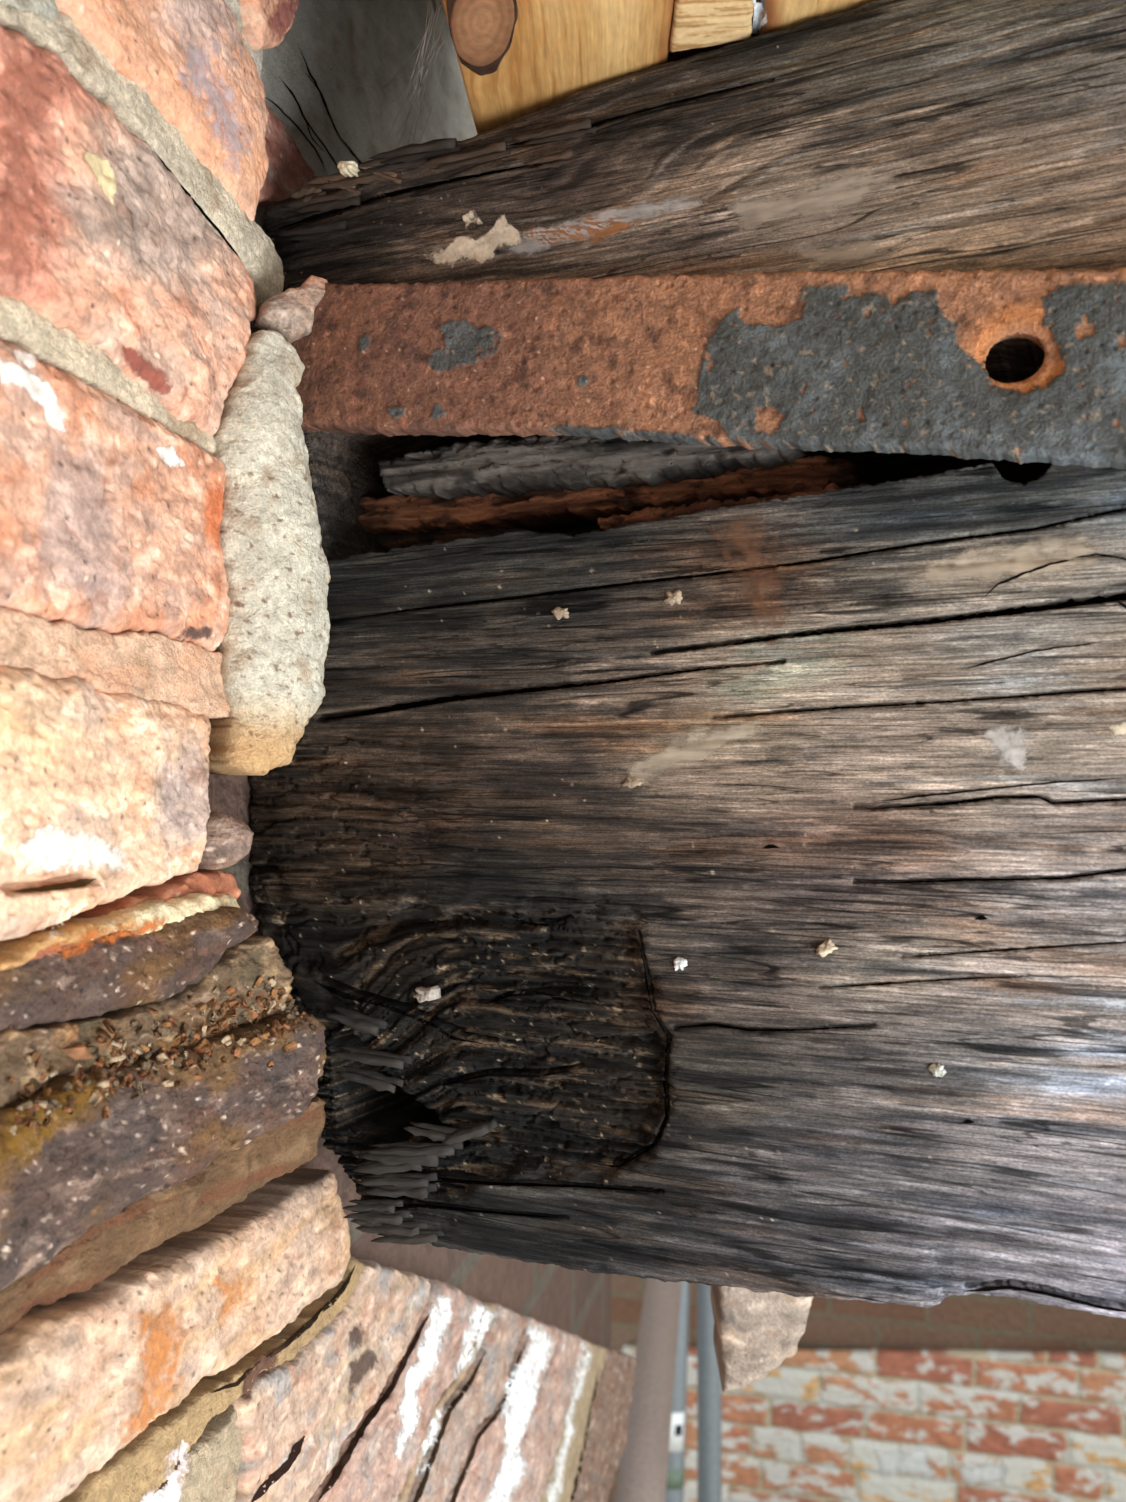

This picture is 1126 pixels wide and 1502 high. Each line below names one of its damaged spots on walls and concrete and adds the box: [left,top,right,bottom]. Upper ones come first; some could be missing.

crack [581,79,771,130]
crack [267,45,537,229]
crack [319,508,1126,719]
crack [856,777,1126,809]
crack [873,869,1126,883]
crack [511,915,561,926]
crack [823,942,1126,988]
crack [313,981,571,1086]
crack [396,934,873,1218]